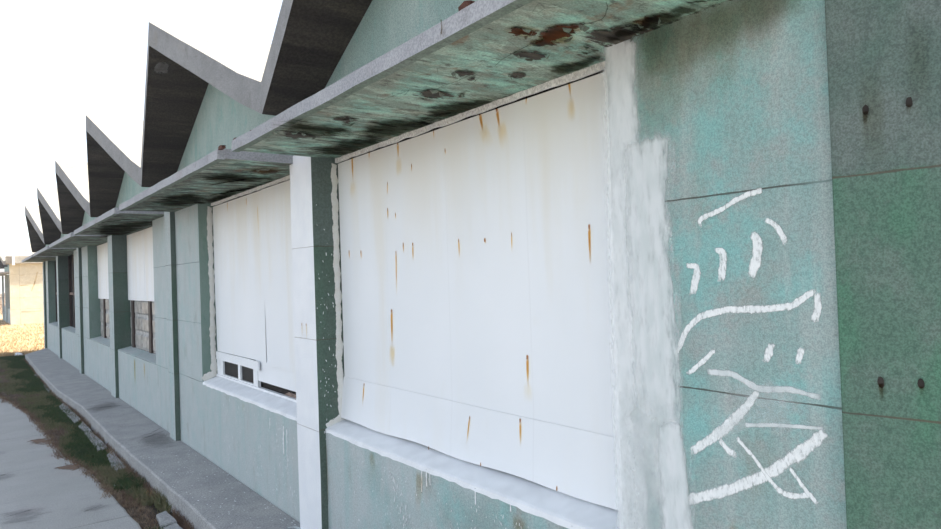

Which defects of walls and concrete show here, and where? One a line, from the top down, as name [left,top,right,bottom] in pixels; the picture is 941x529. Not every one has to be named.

mould [608,0,713,42]
mould [551,53,602,74]
mould [280,98,502,157]
mould [152,173,281,207]